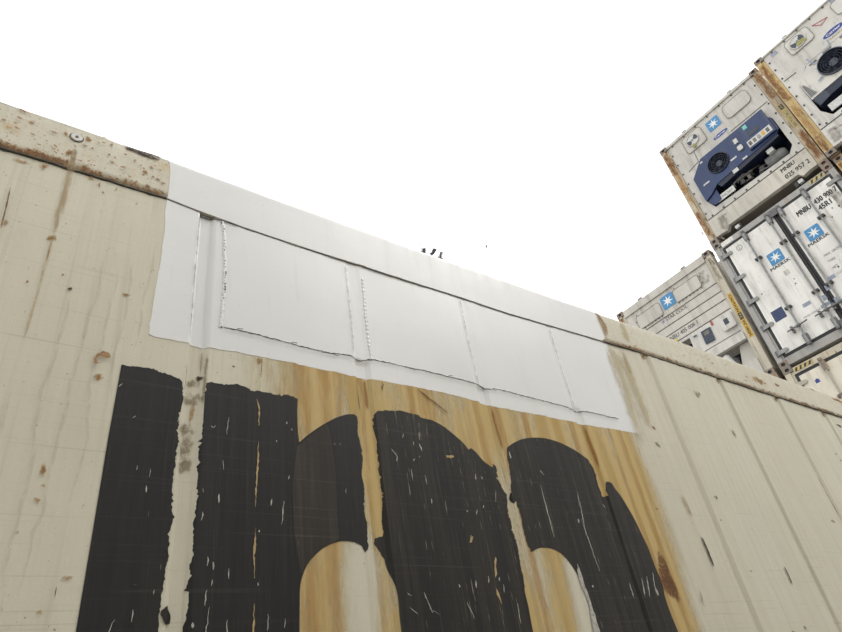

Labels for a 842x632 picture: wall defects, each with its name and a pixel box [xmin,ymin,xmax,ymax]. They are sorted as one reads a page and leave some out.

corrosion [0,130,165,194]
corrosion [596,313,834,417]
corrosion [294,363,699,632]
peeling [160,606,171,625]